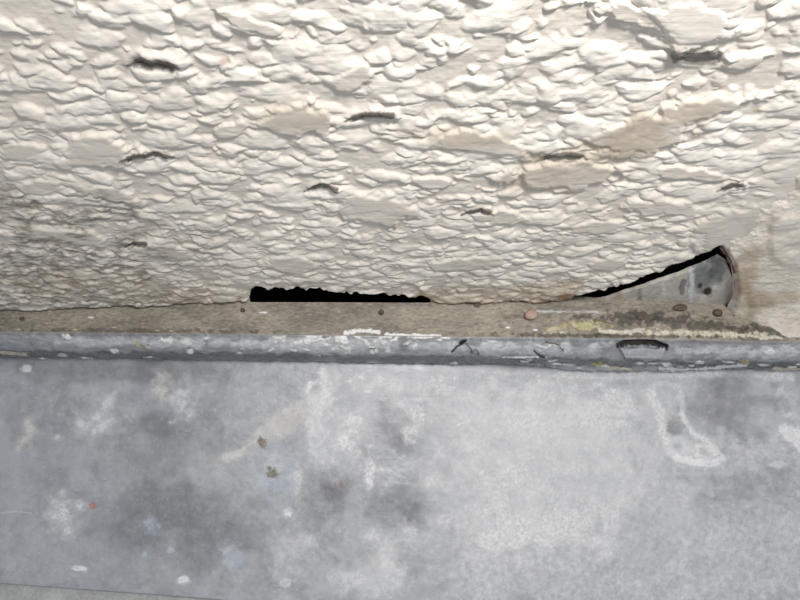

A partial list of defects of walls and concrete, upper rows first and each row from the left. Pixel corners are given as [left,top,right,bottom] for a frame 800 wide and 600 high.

crack [126,60,177,72]
crack [344,111,395,122]
crack [119,153,174,163]
crack [536,152,583,162]
crack [303,184,339,192]
crack [460,208,493,216]
spalling [574,245,733,305]
hole [250,286,431,303]